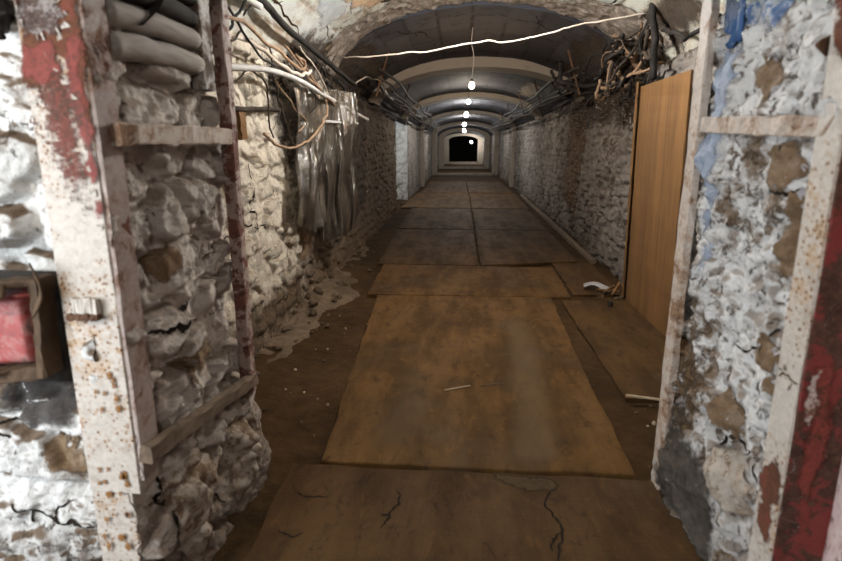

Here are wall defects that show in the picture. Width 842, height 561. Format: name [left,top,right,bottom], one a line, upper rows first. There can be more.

spalling [314,0,673,89]
peeling [15,0,103,230]
crack [148,301,192,335]
corrosion [94,372,121,413]
peeling [796,364,840,507]
crack [11,499,94,529]
corrosion [97,467,130,499]
corrosion [102,513,131,551]
crack [152,476,181,533]
crack [540,477,564,561]
peeling [822,462,842,561]